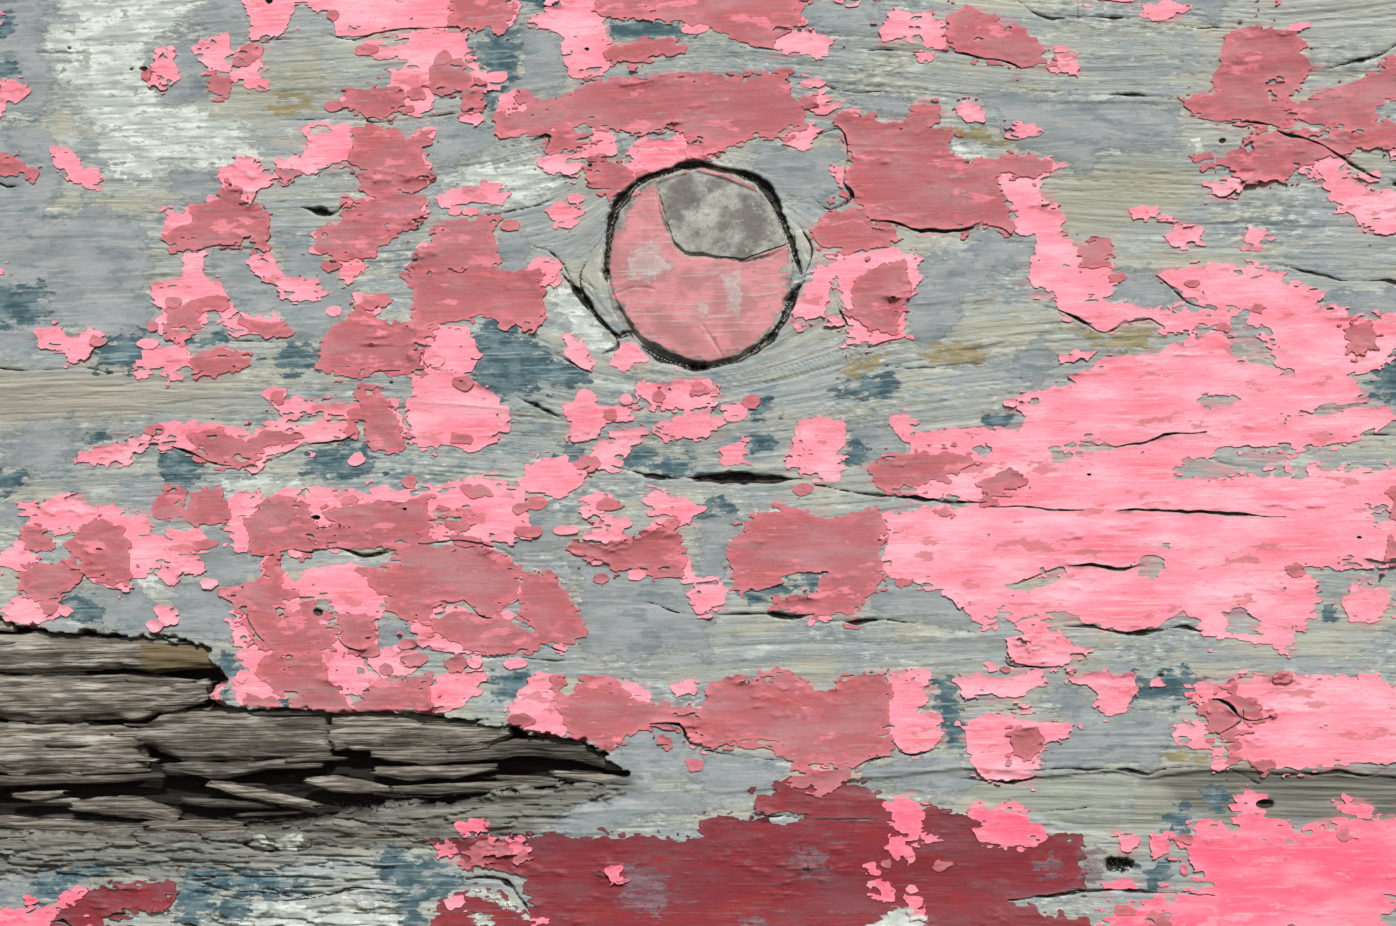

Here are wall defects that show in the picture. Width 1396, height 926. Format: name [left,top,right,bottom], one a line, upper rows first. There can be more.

crack [1329,44,1396,68]
peeling [1178,19,1396,235]
peeling [1129,205,1206,250]
peeling [608,169,799,363]
peeling [620,376,775,443]
peeling [515,389,697,503]
peeling [718,434,779,467]
crack [614,466,1075,511]
peeling [1322,580,1396,623]
peeling [1005,636,1073,672]
peeling [1095,783,1396,926]
peeling [0,860,312,926]